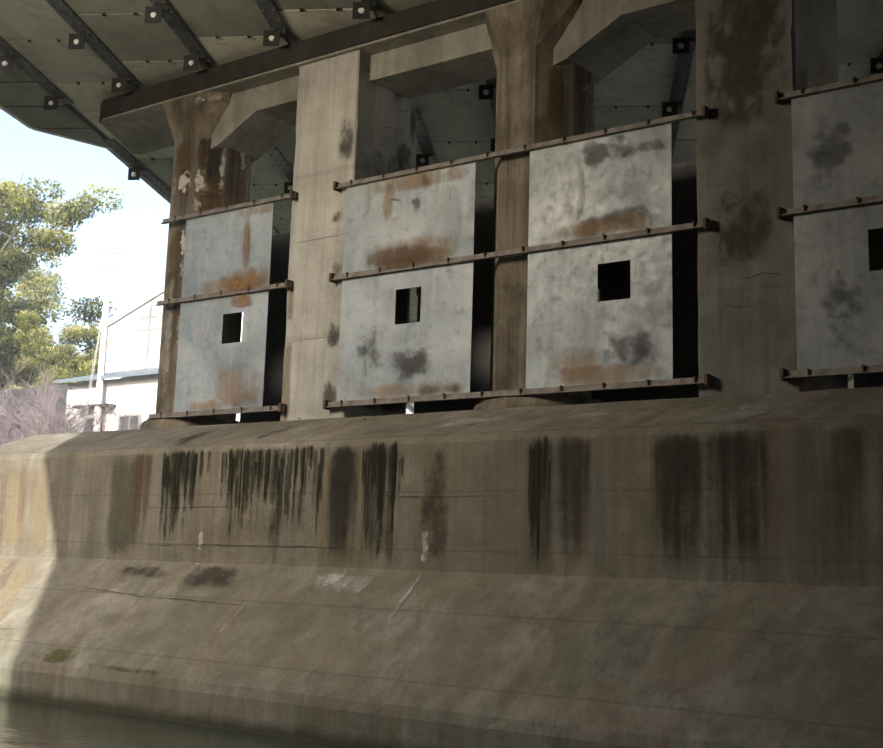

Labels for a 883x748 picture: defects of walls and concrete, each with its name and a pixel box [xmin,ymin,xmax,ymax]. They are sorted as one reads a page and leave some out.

peeling [178,169,205,211]
corrosion [228,224,263,306]
corrosion [372,246,441,269]
leakage [159,450,211,535]
leakage [220,442,403,543]
leakage [528,437,589,551]
leakage [655,433,766,555]
leakage [185,563,234,585]